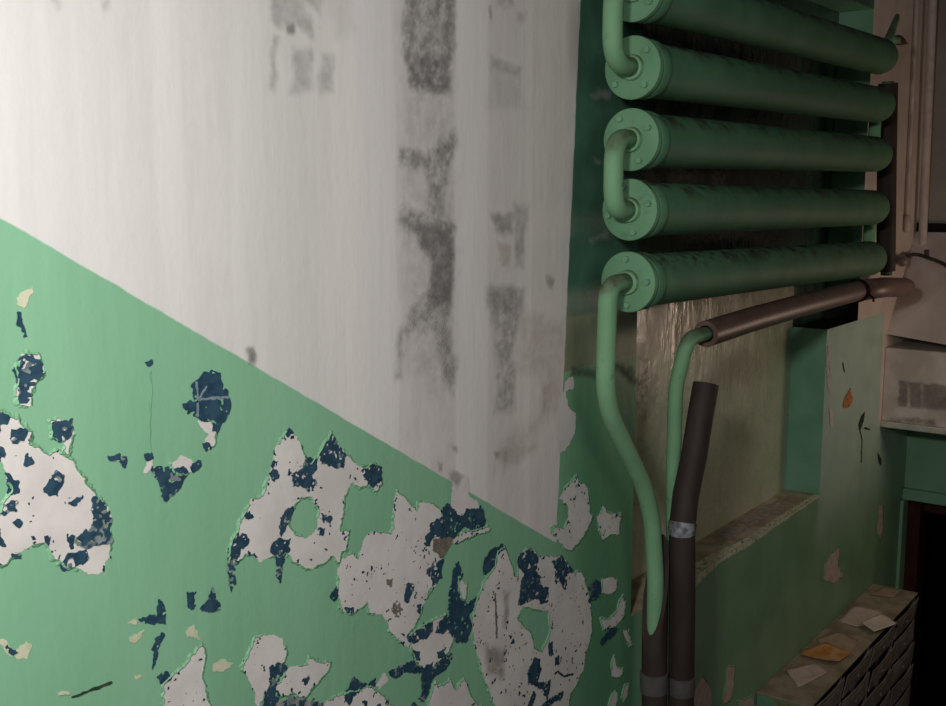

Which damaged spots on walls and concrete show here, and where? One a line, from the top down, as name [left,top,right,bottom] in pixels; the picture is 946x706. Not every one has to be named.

peeling [16,287,34,337]
peeling [0,349,114,575]
peeling [107,453,128,468]
peeling [144,370,231,502]
peeling [555,376,576,453]
peeling [127,428,633,706]
peeling [823,547,844,585]
peeling [0,639,32,660]
peeling [694,664,755,706]